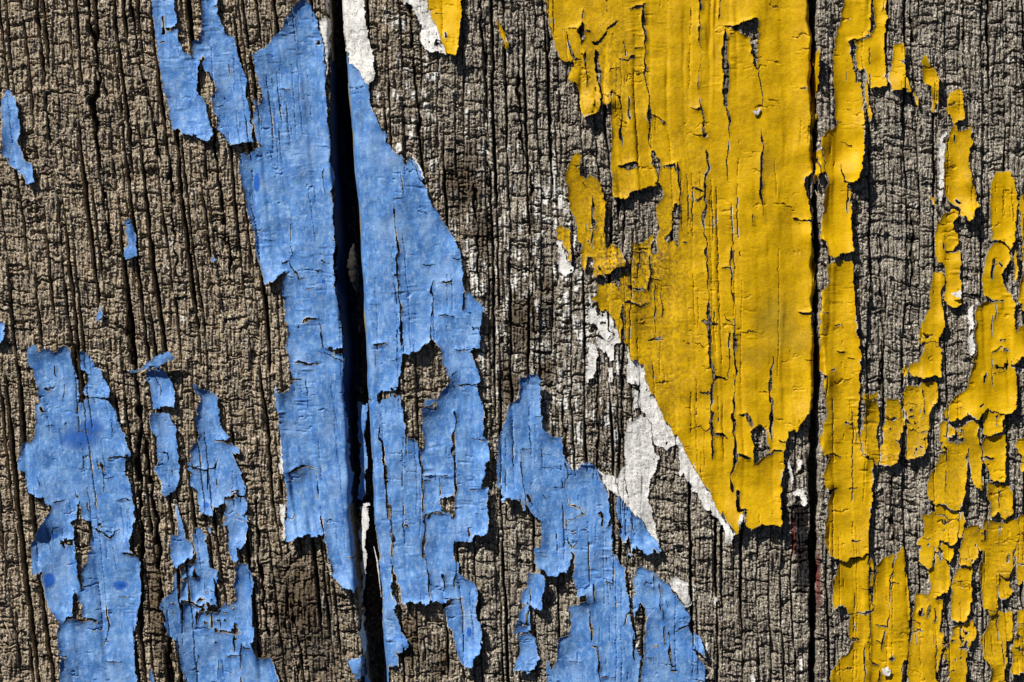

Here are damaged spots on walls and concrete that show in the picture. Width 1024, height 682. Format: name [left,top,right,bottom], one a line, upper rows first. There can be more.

peeling [17,345,154,682]
peeling [130,0,706,682]
peeling [546,0,1024,682]